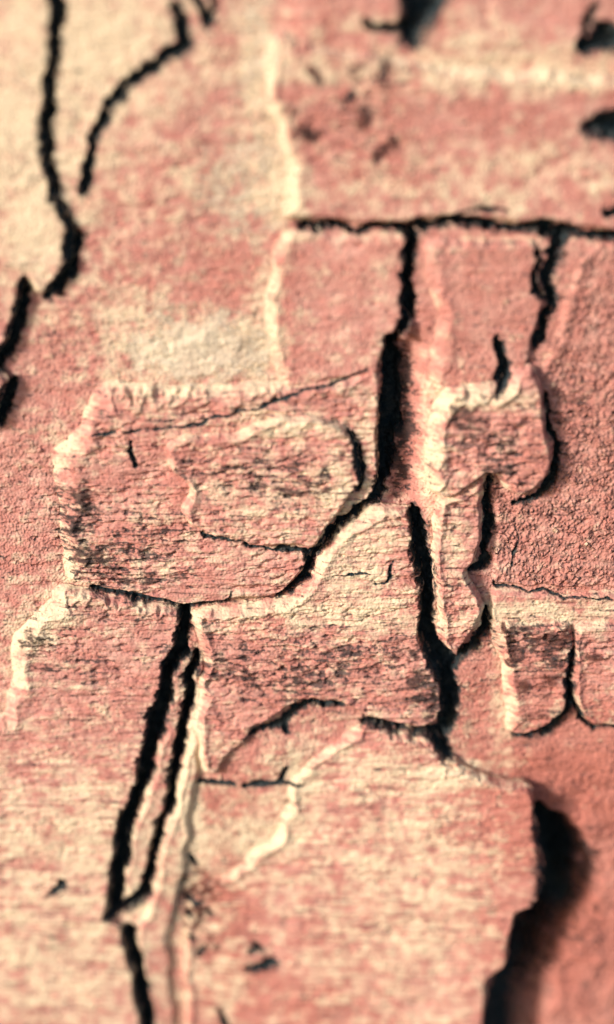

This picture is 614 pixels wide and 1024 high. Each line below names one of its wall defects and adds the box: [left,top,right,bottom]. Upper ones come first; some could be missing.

peeling [0,0,76,349]
crack [0,0,219,428]
crack [90,584,304,1024]
peeling [0,225,545,1024]
crack [91,206,614,762]
spalling [422,236,614,733]